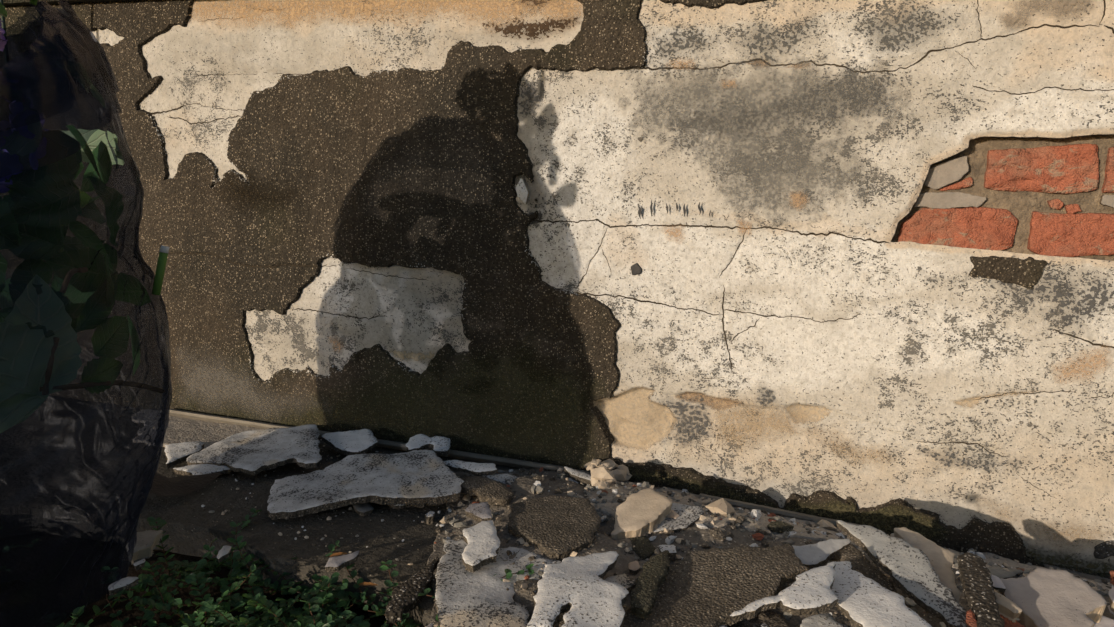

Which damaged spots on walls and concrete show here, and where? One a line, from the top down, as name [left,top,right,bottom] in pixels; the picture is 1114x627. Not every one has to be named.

flaking render [85,29,124,46]
flaking render [139,0,464,179]
flaking render [477,26,581,53]
crack [596,0,1114,95]
flaking render [245,257,471,381]
crack [533,219,889,379]
flaking render [514,0,1114,573]
crack [1051,329,1114,348]
water stain [663,382,789,448]
water stain [917,448,1028,476]
crack [918,391,1114,499]
flaking render [1093,587,1114,627]